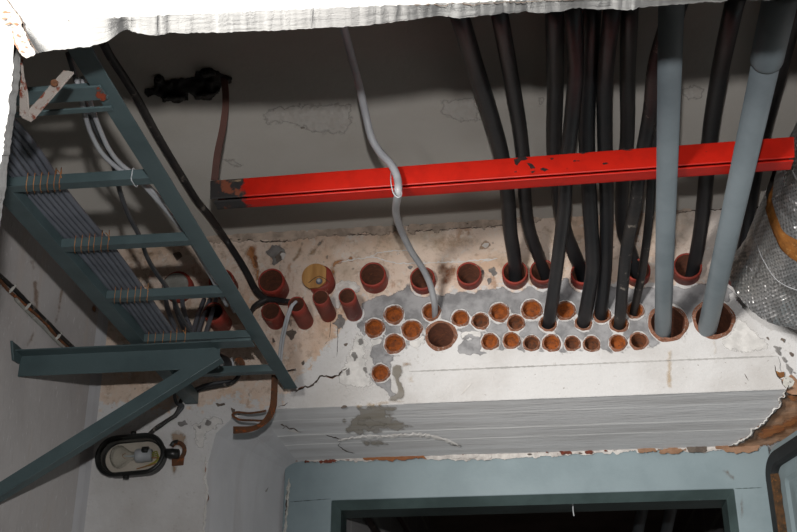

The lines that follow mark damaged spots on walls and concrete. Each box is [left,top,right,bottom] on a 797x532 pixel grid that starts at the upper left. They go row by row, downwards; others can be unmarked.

spalling [0,0,38,58]
spalling [266,245,286,265]
crack [278,322,347,433]
damp [343,364,408,445]
spalling [296,319,797,464]
rust [770,473,787,532]